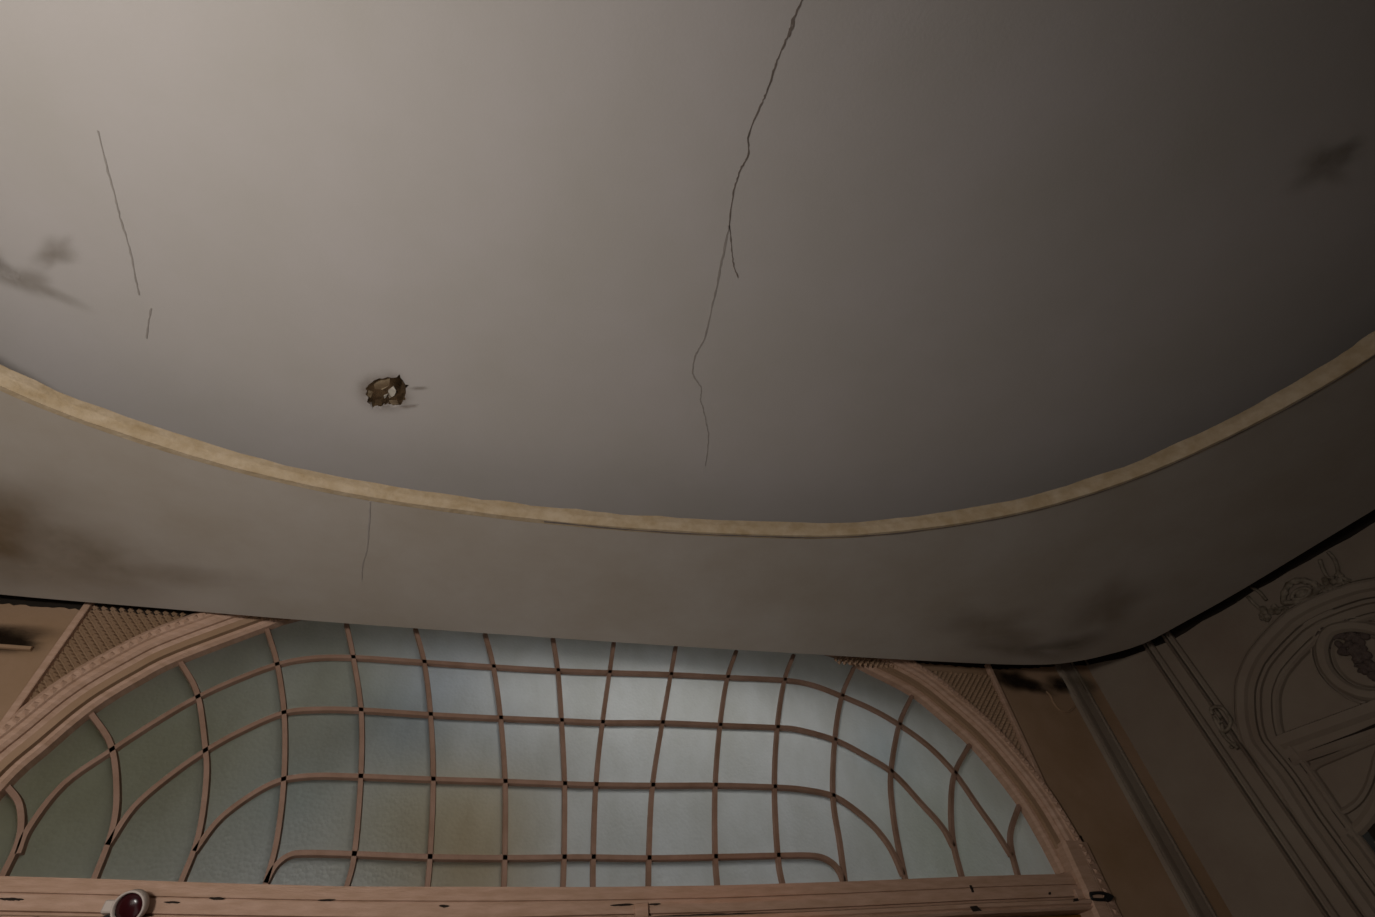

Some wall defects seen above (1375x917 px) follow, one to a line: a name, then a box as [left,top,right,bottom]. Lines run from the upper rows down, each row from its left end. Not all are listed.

spalling [366,374,408,407]
crack [692,0,803,466]